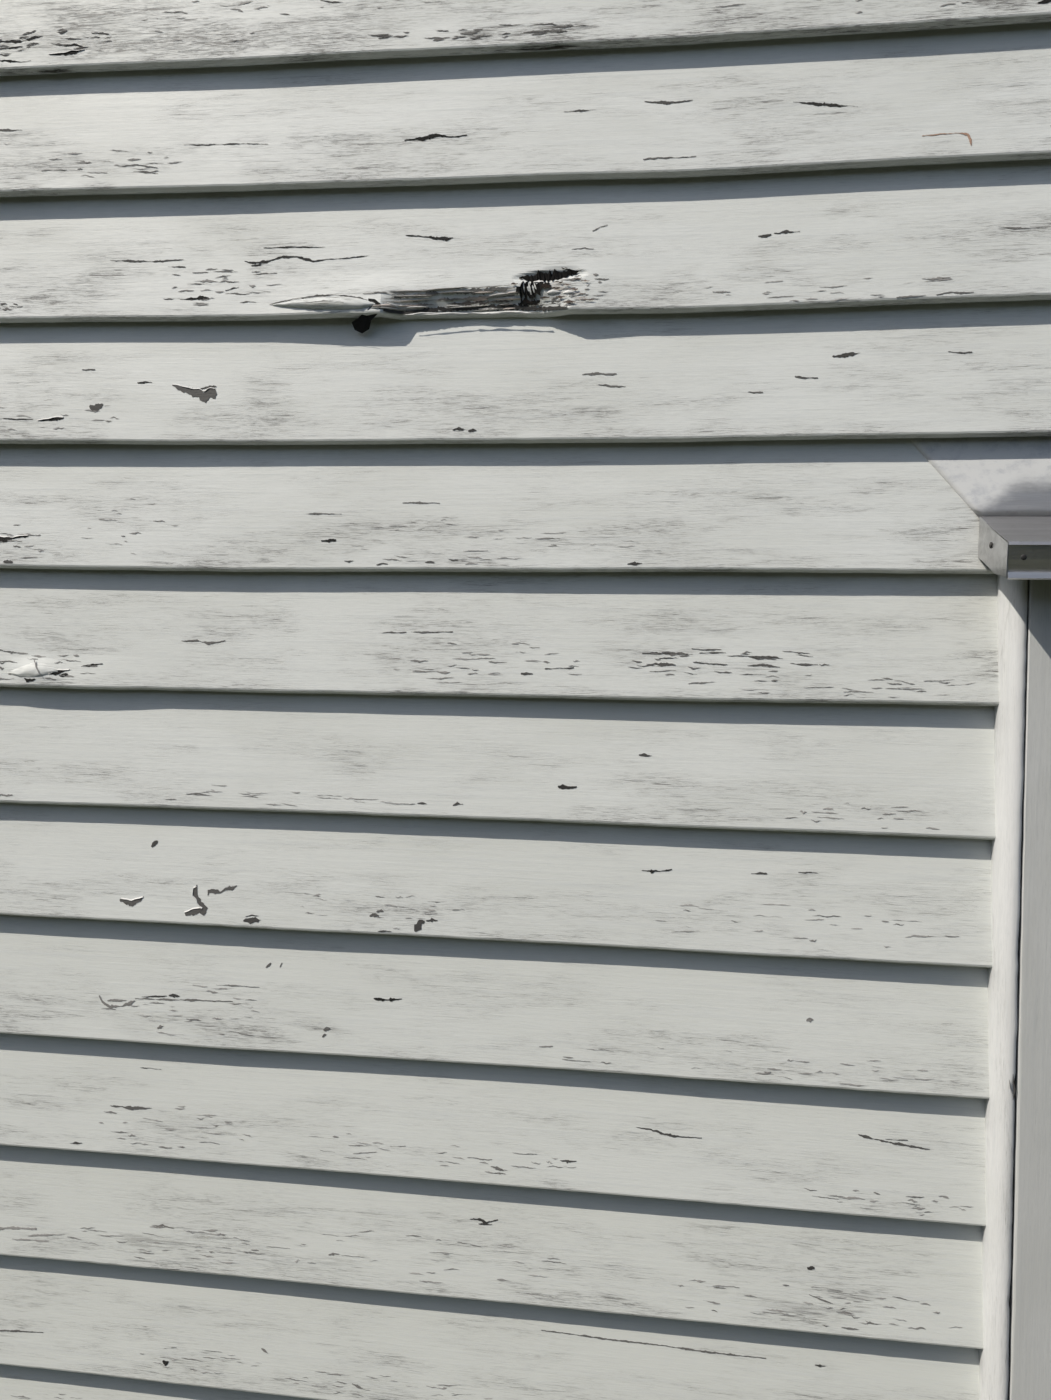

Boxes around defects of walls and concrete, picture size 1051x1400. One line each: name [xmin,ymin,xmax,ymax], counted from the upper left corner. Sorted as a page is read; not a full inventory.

peeling [429,23,588,41]
peeling [0,28,111,62]
peeling [534,267,607,306]
peeling [172,384,217,403]
peeling [0,524,45,563]
peeling [120,896,143,906]
peeling [185,885,237,916]
crack [637,1127,697,1138]
crack [858,1134,930,1150]